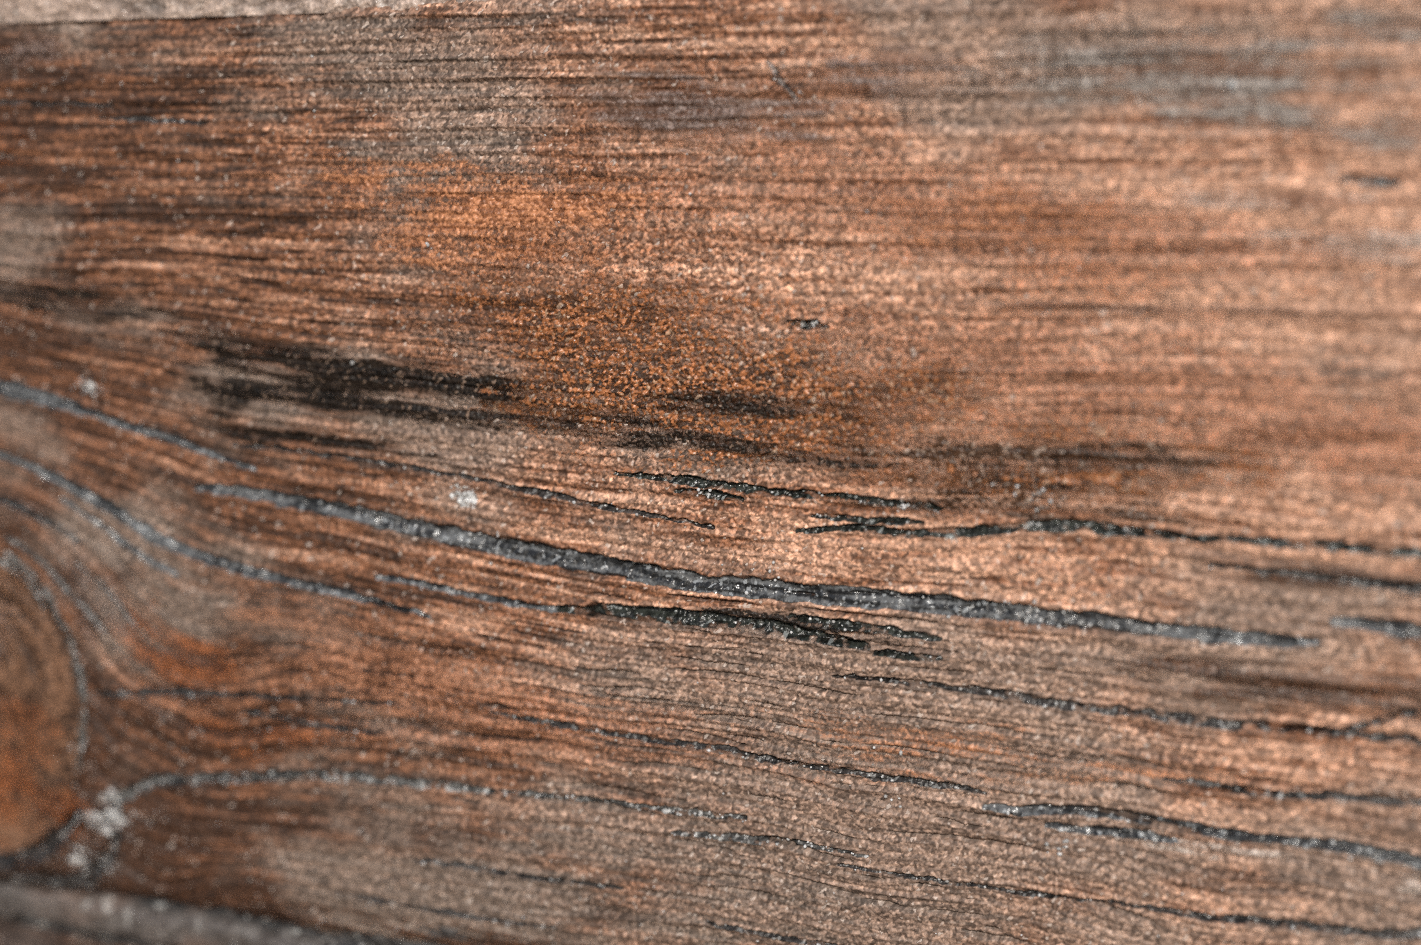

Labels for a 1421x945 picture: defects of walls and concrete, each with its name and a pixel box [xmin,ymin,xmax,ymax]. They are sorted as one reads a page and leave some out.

crack [0,380,1421,746]
crack [103,768,1421,940]
crack [705,919,837,945]
crack [490,711,1421,871]